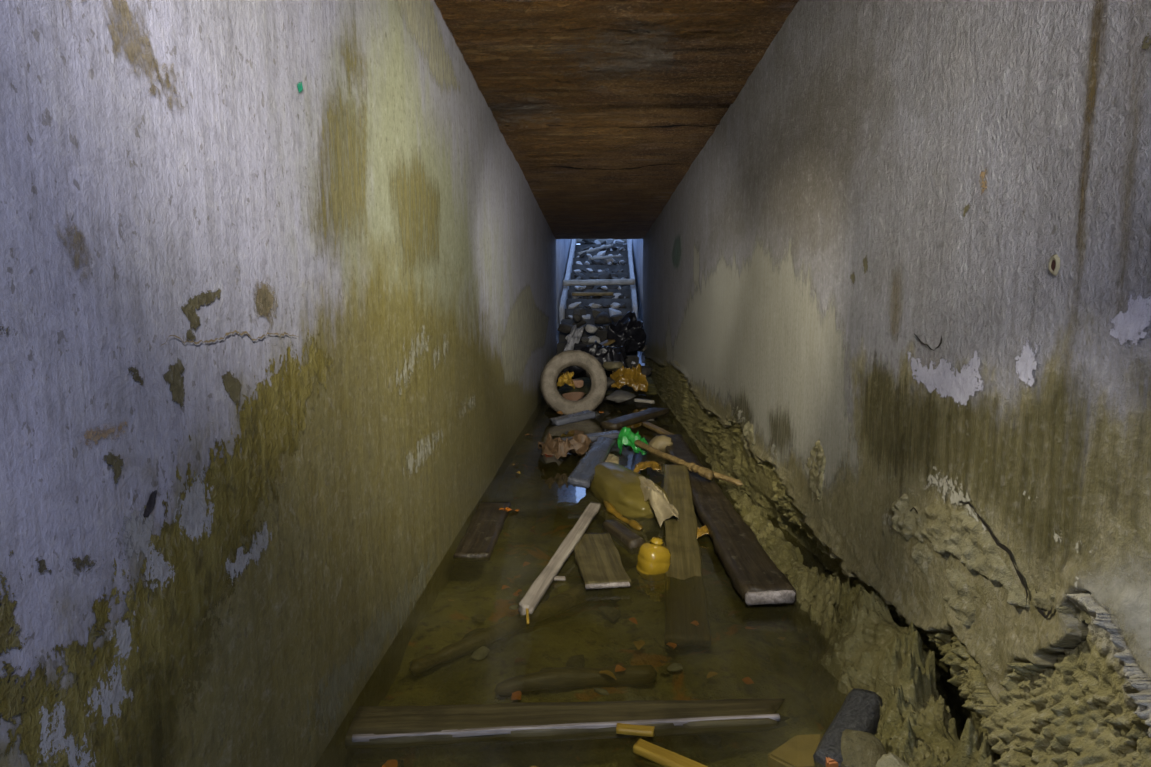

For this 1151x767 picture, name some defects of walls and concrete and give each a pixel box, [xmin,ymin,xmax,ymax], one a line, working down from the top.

leakage [104,0,183,108]
leakage [310,37,367,249]
rust [1077,0,1105,246]
leakage [390,158,440,268]
crack [162,330,303,345]
leakage [254,282,278,327]
peeling [1015,337,1038,387]
peeling [1107,293,1151,347]
leakage [665,241,1151,658]
peeling [0,320,335,767]
spalling [644,350,1151,767]
crack [959,501,1052,618]